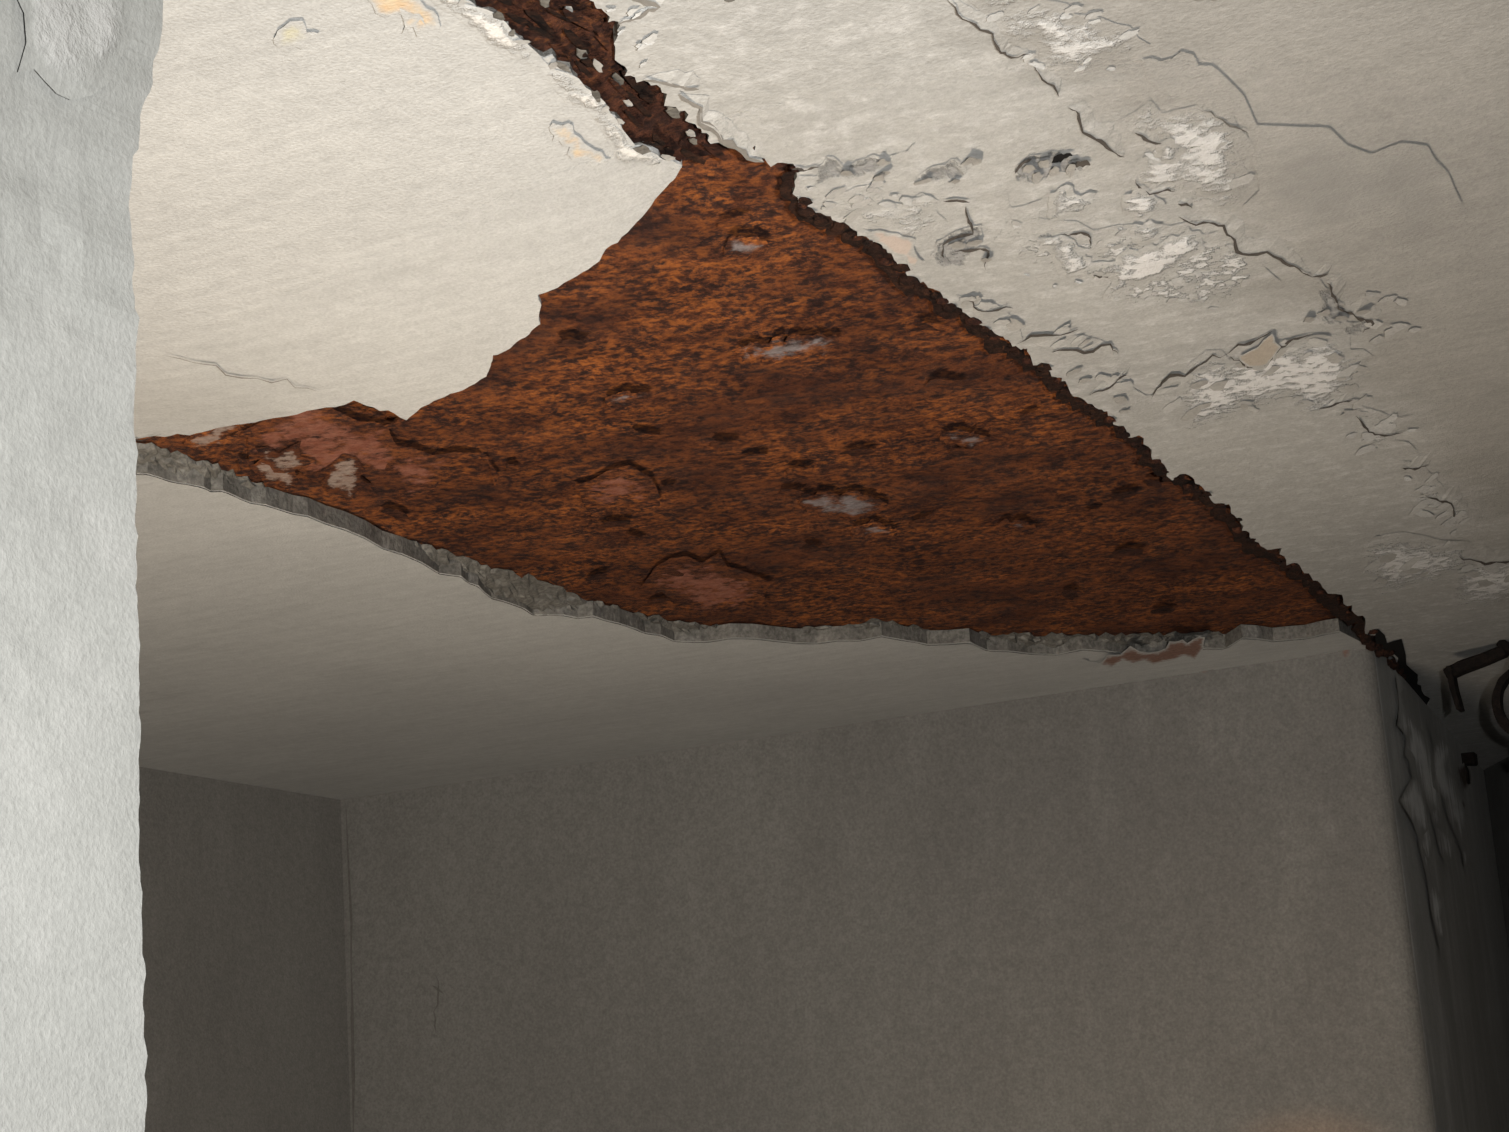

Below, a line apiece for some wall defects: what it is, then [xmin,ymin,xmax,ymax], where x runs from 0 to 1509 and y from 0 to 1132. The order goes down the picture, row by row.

rust [368,0,727,175]
peeling [606,0,664,36]
crack [792,165,819,173]
peeling [968,0,1150,84]
crack [947,0,1382,332]
spalling [136,33,1509,656]
crack [941,199,1312,399]
rust [1083,637,1205,668]